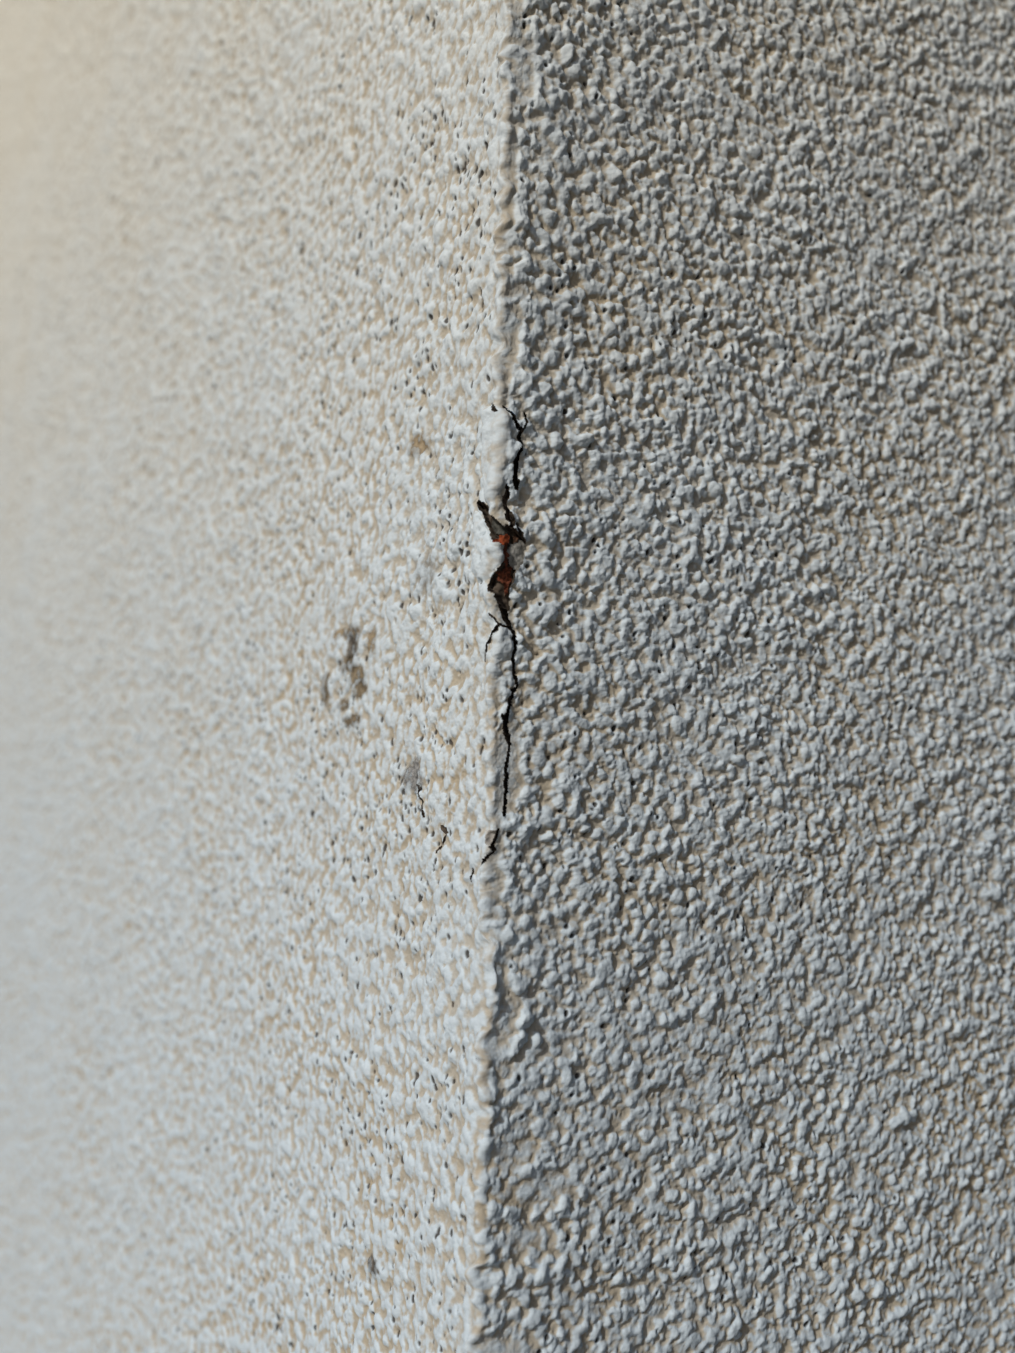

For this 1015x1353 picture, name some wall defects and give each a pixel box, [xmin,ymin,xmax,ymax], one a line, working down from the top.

crack [490,403,529,490]
crack [470,602,519,882]